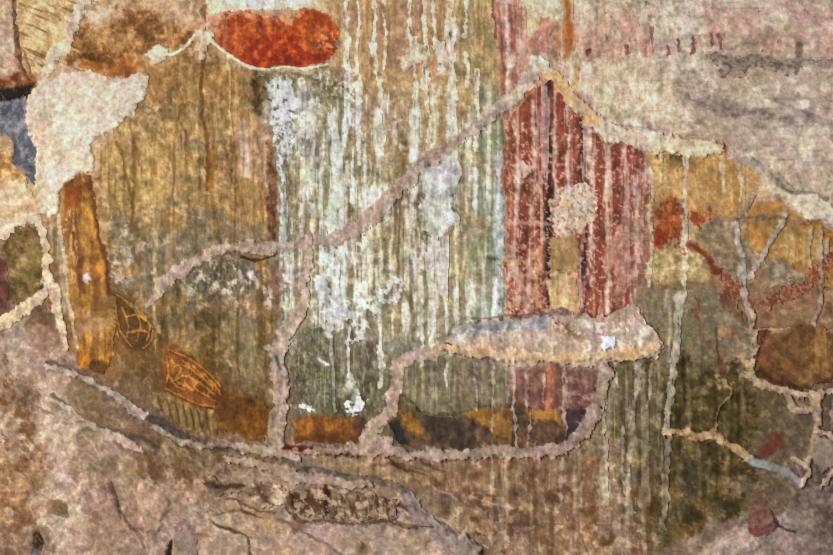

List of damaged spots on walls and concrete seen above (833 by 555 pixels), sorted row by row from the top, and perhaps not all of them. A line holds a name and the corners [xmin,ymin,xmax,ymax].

water stain [343,0,481,151]
peeling [0,69,149,240]
water stain [247,75,308,242]
crack [0,66,614,555]
efflorescence [315,126,348,235]
efflorescence [315,244,402,417]
water stain [417,148,462,301]
water stain [494,191,506,316]
crack [661,309,833,490]
crack [709,156,828,226]
flaking render [755,322,833,392]
flaking render [696,477,833,555]